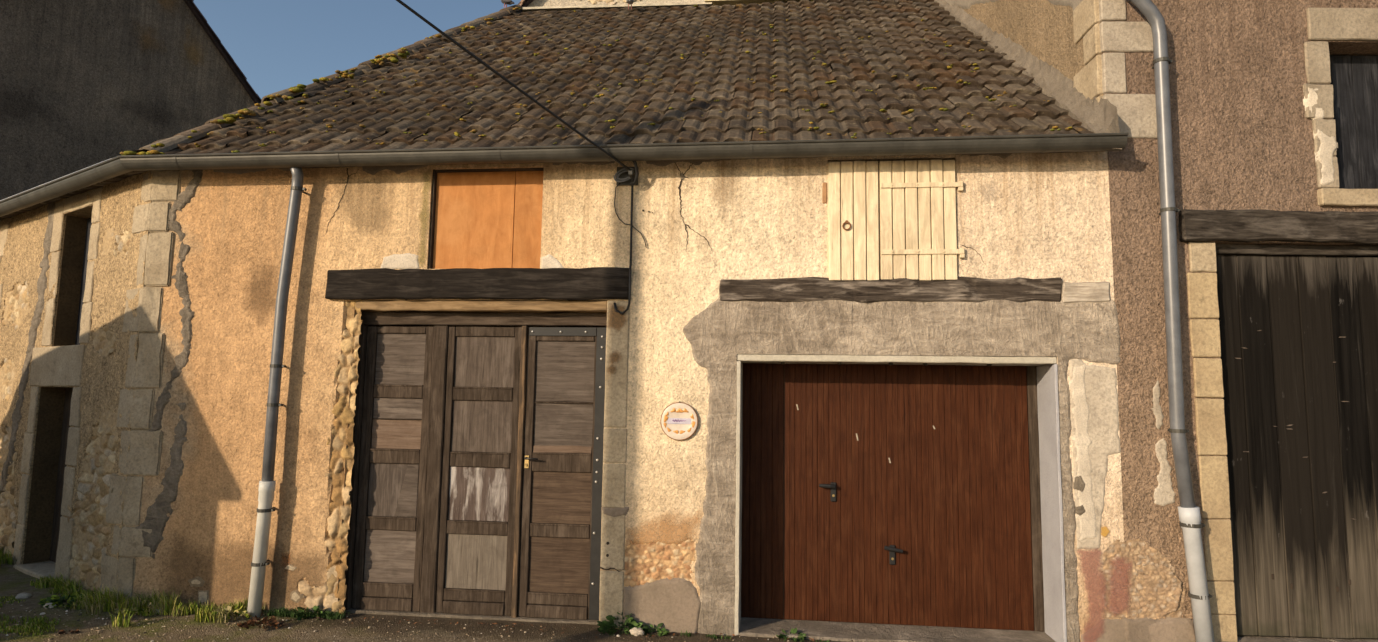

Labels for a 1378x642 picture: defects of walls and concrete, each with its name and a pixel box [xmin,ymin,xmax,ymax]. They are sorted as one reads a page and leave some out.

peeling [1303,87,1338,185]
crack [675,163,712,250]
flaking render [1069,363,1185,642]
flaking render [622,539,698,587]